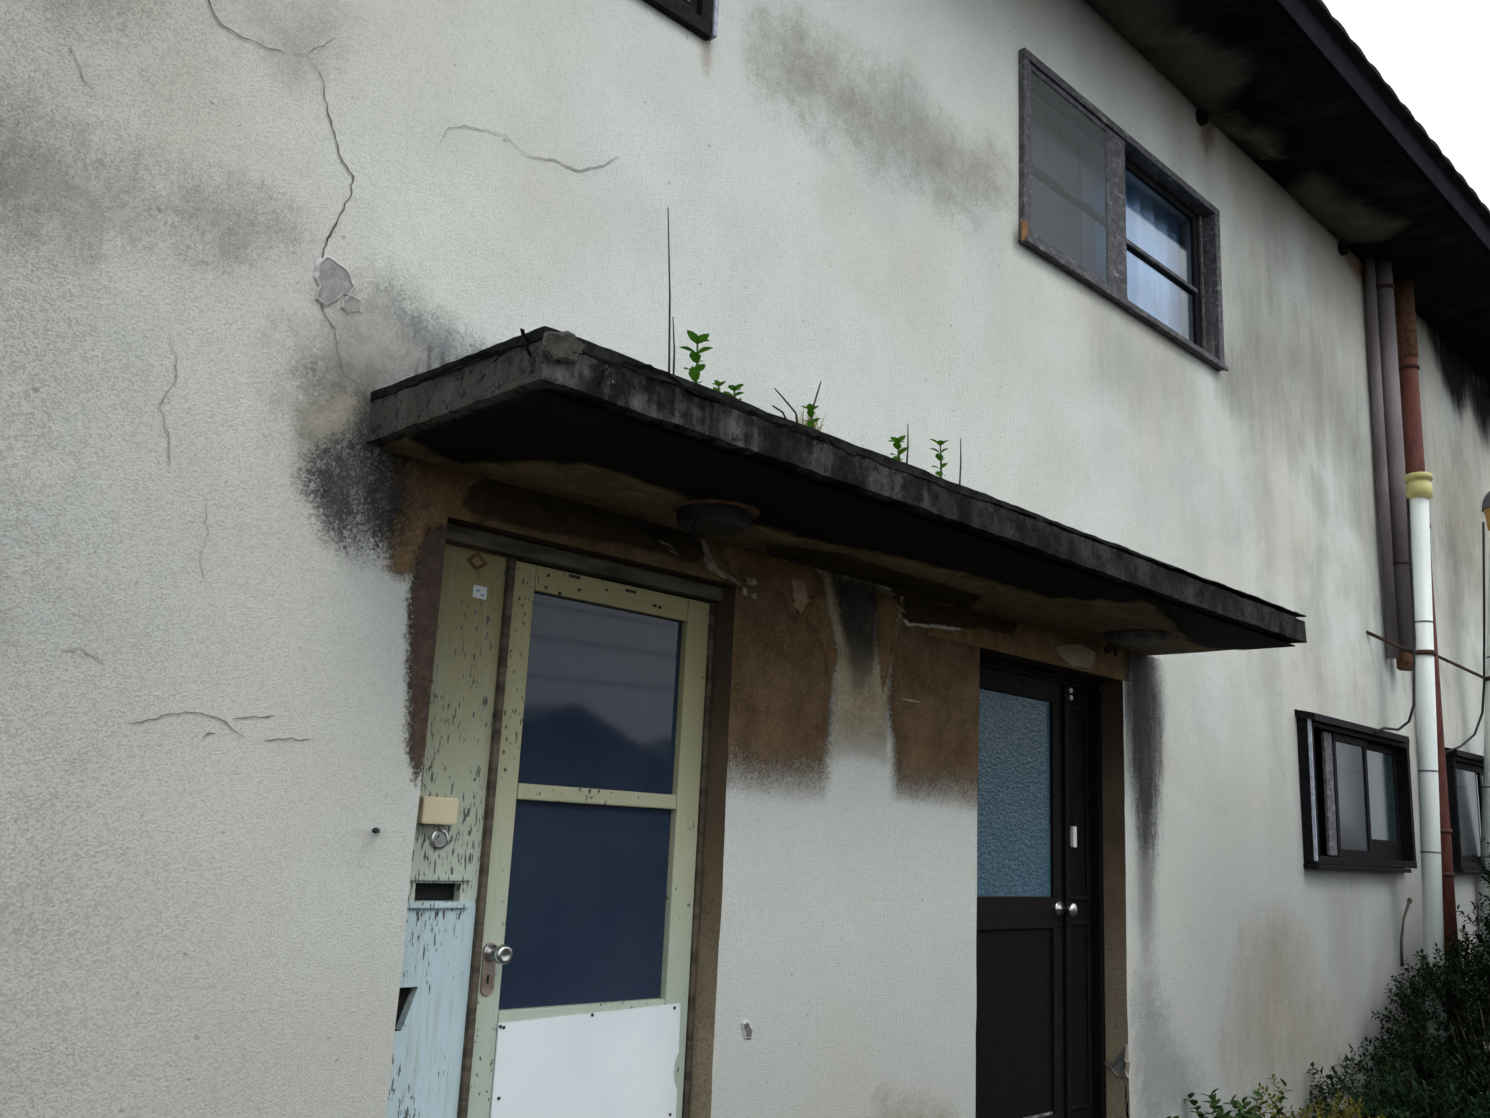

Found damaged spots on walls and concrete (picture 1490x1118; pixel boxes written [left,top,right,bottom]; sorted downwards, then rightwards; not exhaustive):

crack [208,0,354,258]
crack [442,125,621,171]
flaking render [313,255,362,315]
leakage [1416,313,1490,439]
peeling [463,478,758,599]
leakage [306,308,1296,845]
peeling [767,543,1017,634]
crack [128,711,310,741]